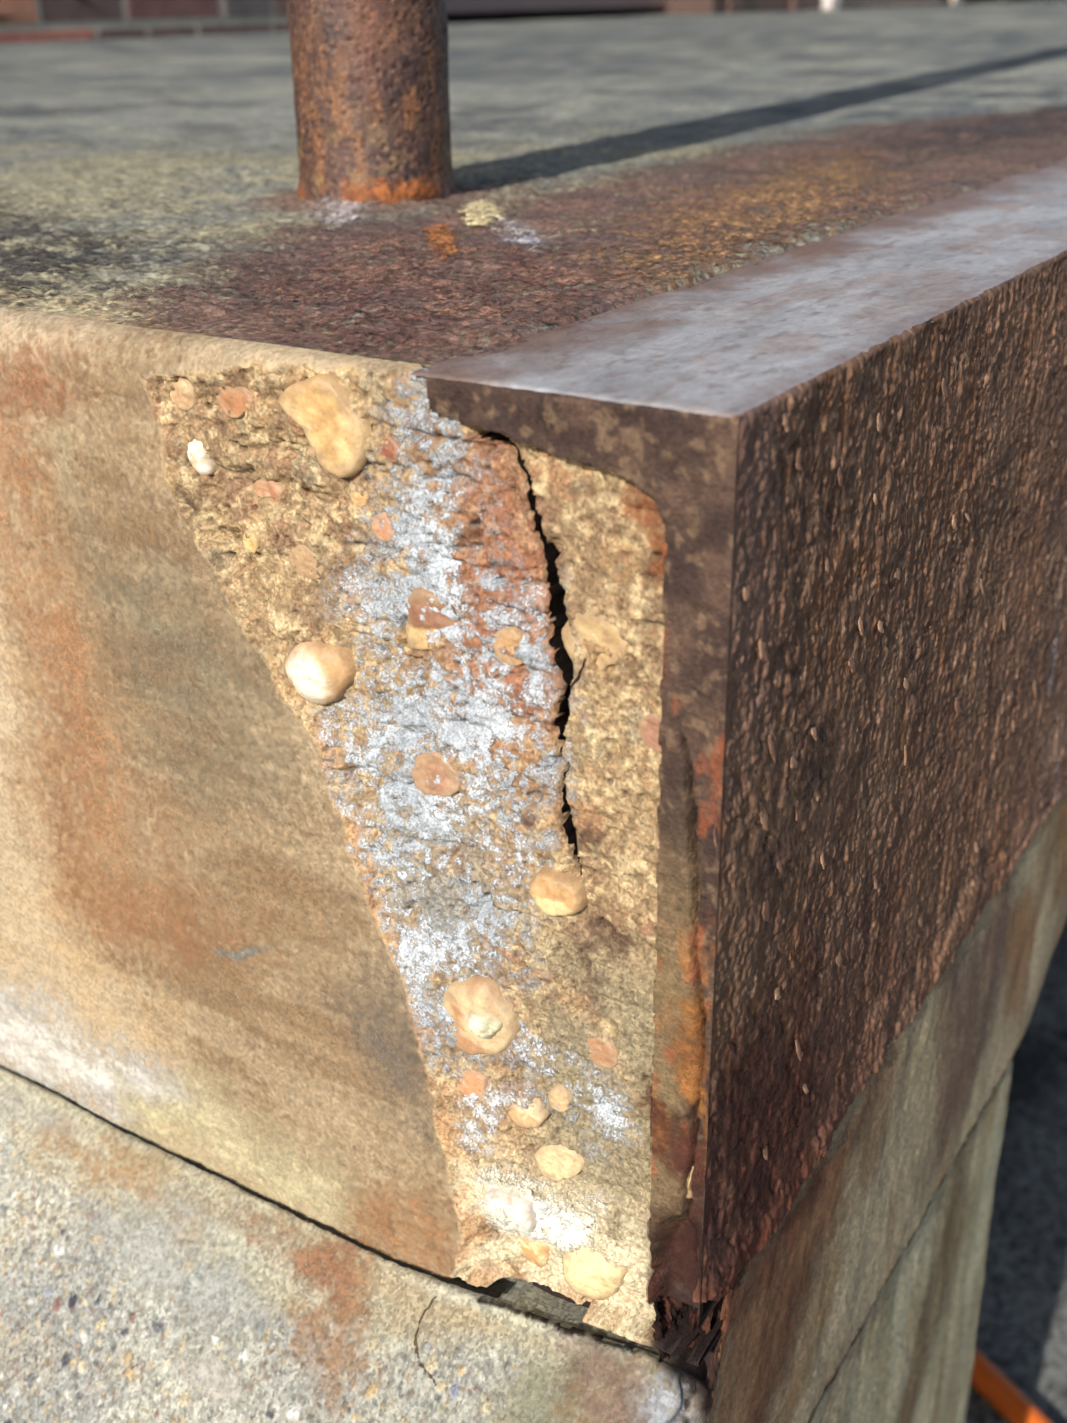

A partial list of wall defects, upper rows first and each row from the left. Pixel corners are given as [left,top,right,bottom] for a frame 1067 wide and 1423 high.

corrosion [94,105,1067,365]
crack [480,431,586,876]
corrosion [625,484,668,575]
corrosion [758,639,768,662]
corrosion [858,617,885,636]
spalling [143,363,724,1361]
corrosion [751,705,846,922]
crack [0,1065,634,1386]
corrosion [646,994,709,1298]
crack [916,1037,1024,1231]